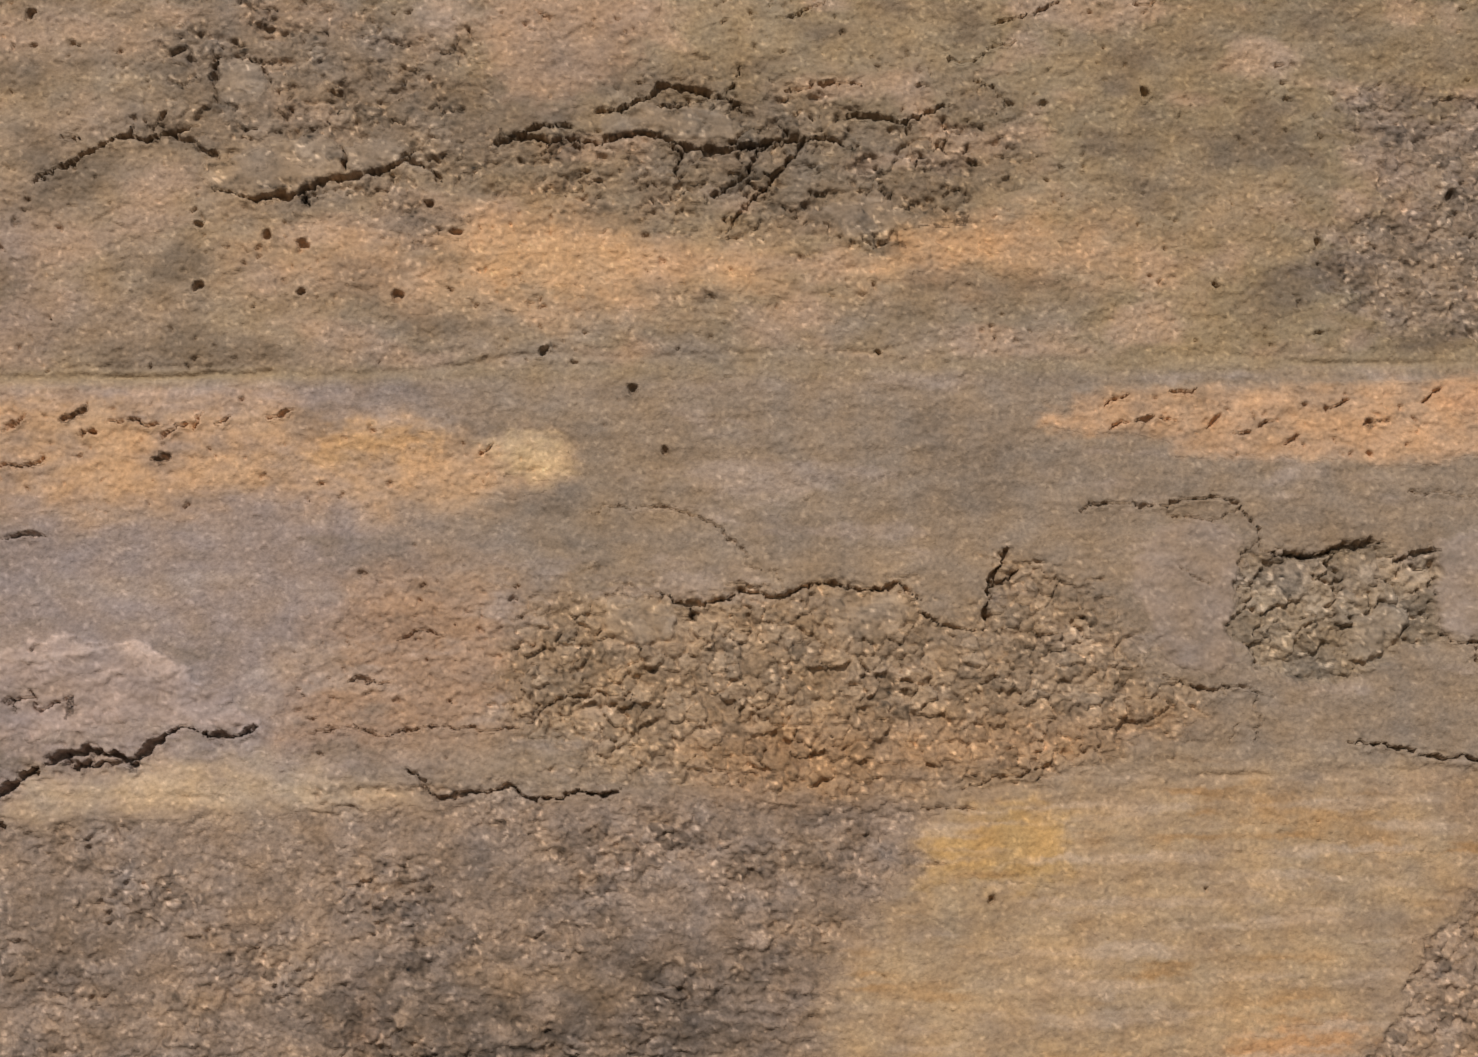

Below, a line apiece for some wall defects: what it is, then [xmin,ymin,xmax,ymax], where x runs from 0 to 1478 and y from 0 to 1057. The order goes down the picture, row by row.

crack [30,108,444,202]
crack [489,0,1062,236]
crack [1073,493,1440,570]
crack [347,672,391,686]
crack [396,628,447,642]
spalling [1224,544,1445,687]
crack [1437,632,1478,666]
crack [0,723,259,832]
crack [298,688,638,804]
spalling [0,549,1227,1057]
crack [1347,739,1478,765]
spalling [1362,888,1478,1057]